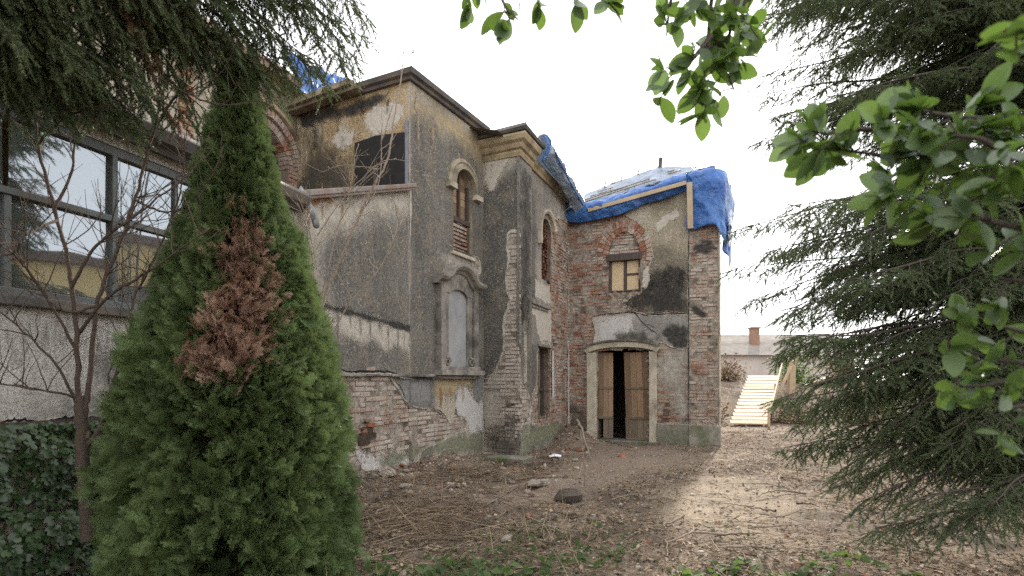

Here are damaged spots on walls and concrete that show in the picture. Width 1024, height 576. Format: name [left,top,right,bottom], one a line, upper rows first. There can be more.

water stain [299,94,389,190]
flaking render [331,101,405,153]
water stain [625,265,707,317]
spalling [338,202,718,473]
water stain [663,325,688,348]